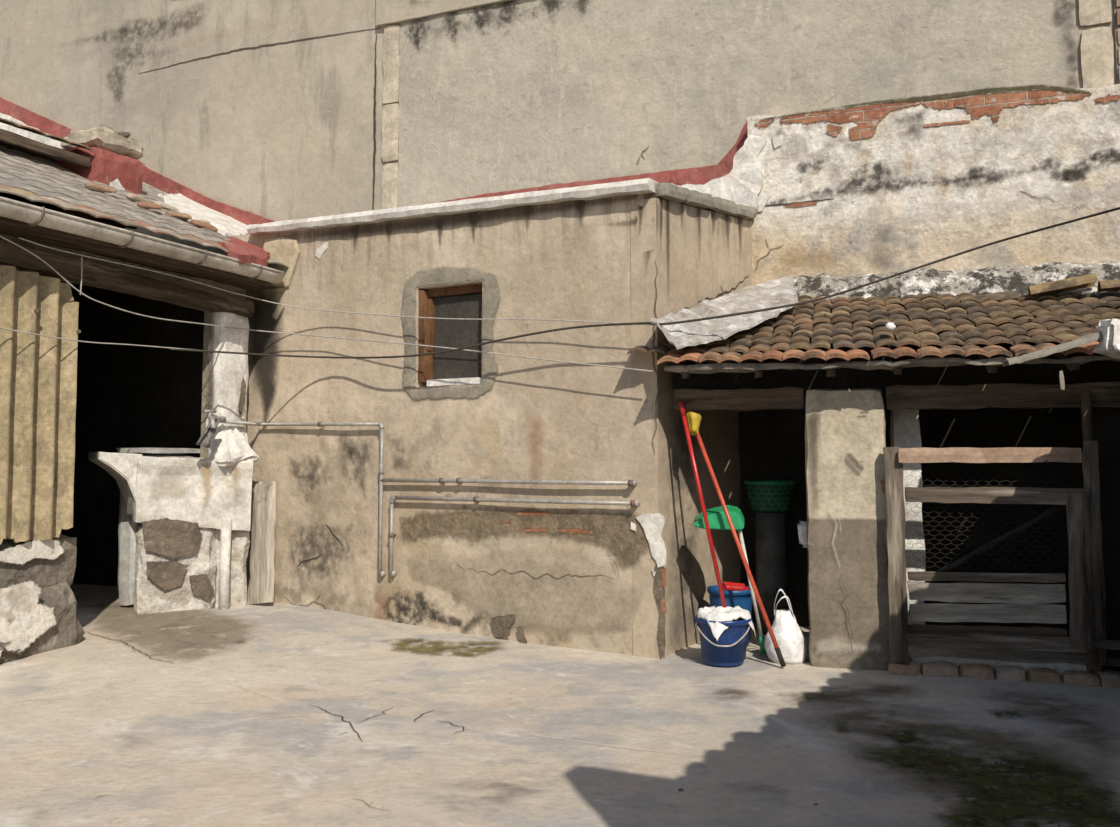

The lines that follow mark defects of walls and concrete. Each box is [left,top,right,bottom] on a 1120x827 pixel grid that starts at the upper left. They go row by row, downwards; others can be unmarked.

damp [475,0,515,27]
damp [826,163,926,193]
flaking render [754,89,1120,212]
damp [946,167,1005,184]
damp [1034,149,1120,181]
peeling [0,539,64,565]
flaking render [400,509,667,657]
crack [457,559,619,580]
peeling [0,580,57,657]
crack [311,705,467,742]